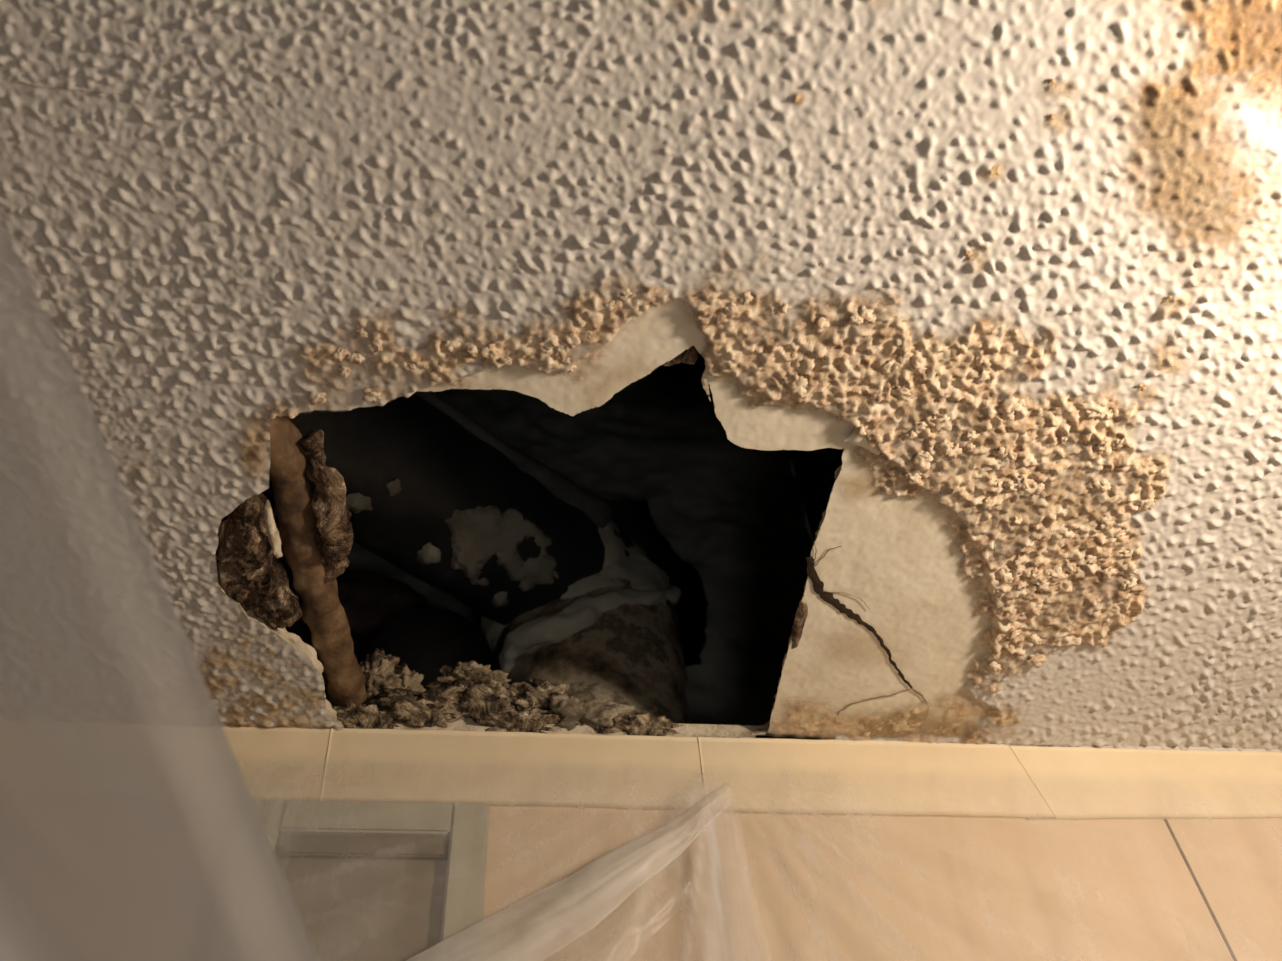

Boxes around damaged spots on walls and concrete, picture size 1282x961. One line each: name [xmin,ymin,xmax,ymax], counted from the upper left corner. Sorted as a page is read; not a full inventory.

water stain [1133,0,1282,242]
flaking render [215,299,993,738]
crack [765,542,929,739]